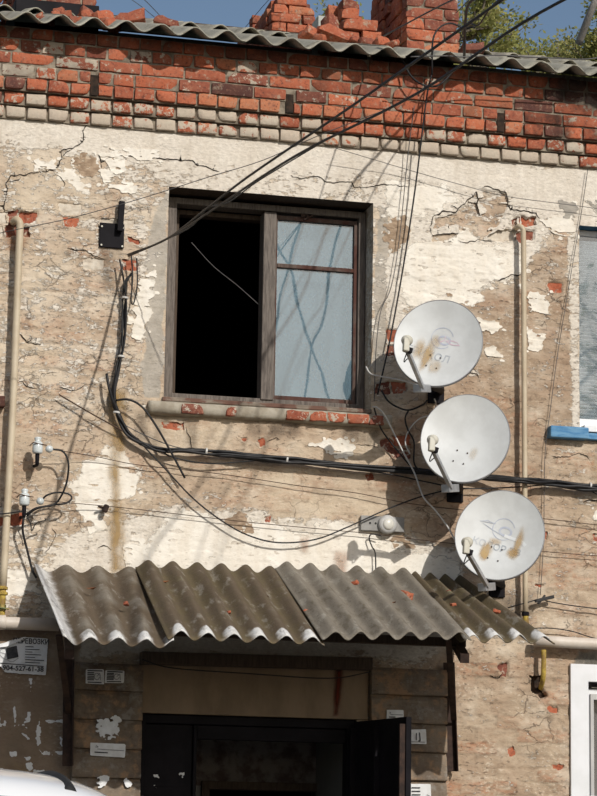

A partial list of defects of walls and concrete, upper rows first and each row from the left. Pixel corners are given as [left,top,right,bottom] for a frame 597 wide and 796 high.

crack [0,125,88,212]
crack [99,150,219,172]
peeling [375,176,597,314]
peeling [121,257,160,341]
spalling [386,327,396,358]
peeling [477,317,506,334]
peeling [484,345,505,362]
peeling [527,327,546,352]
damp [110,390,124,448]
peeling [308,436,356,459]
peeling [63,443,143,538]
damp [112,494,121,571]